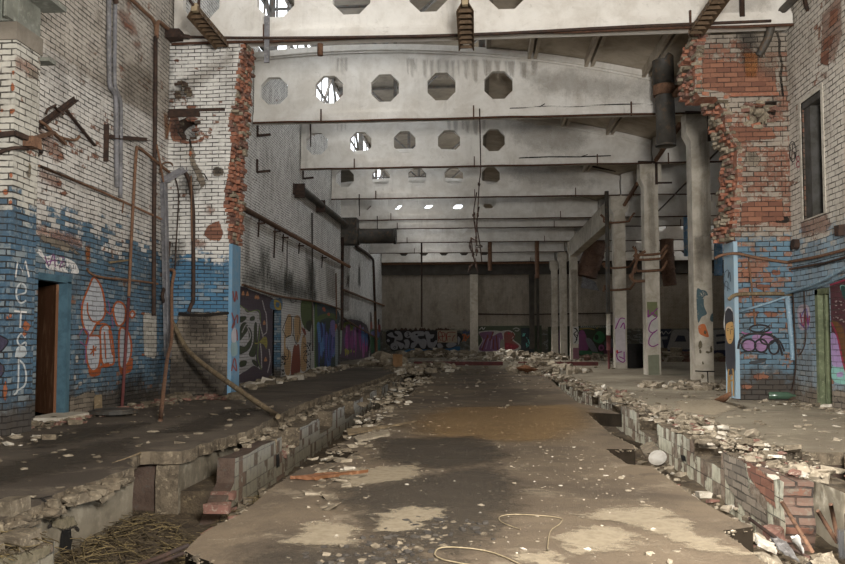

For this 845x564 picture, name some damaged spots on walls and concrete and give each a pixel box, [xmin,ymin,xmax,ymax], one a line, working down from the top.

spalling [169,80,205,144]
spalling [195,43,256,247]
spalling [676,33,789,244]
flaking render [820,0,842,78]
peeling [801,215,831,236]
leakage [245,405,578,564]